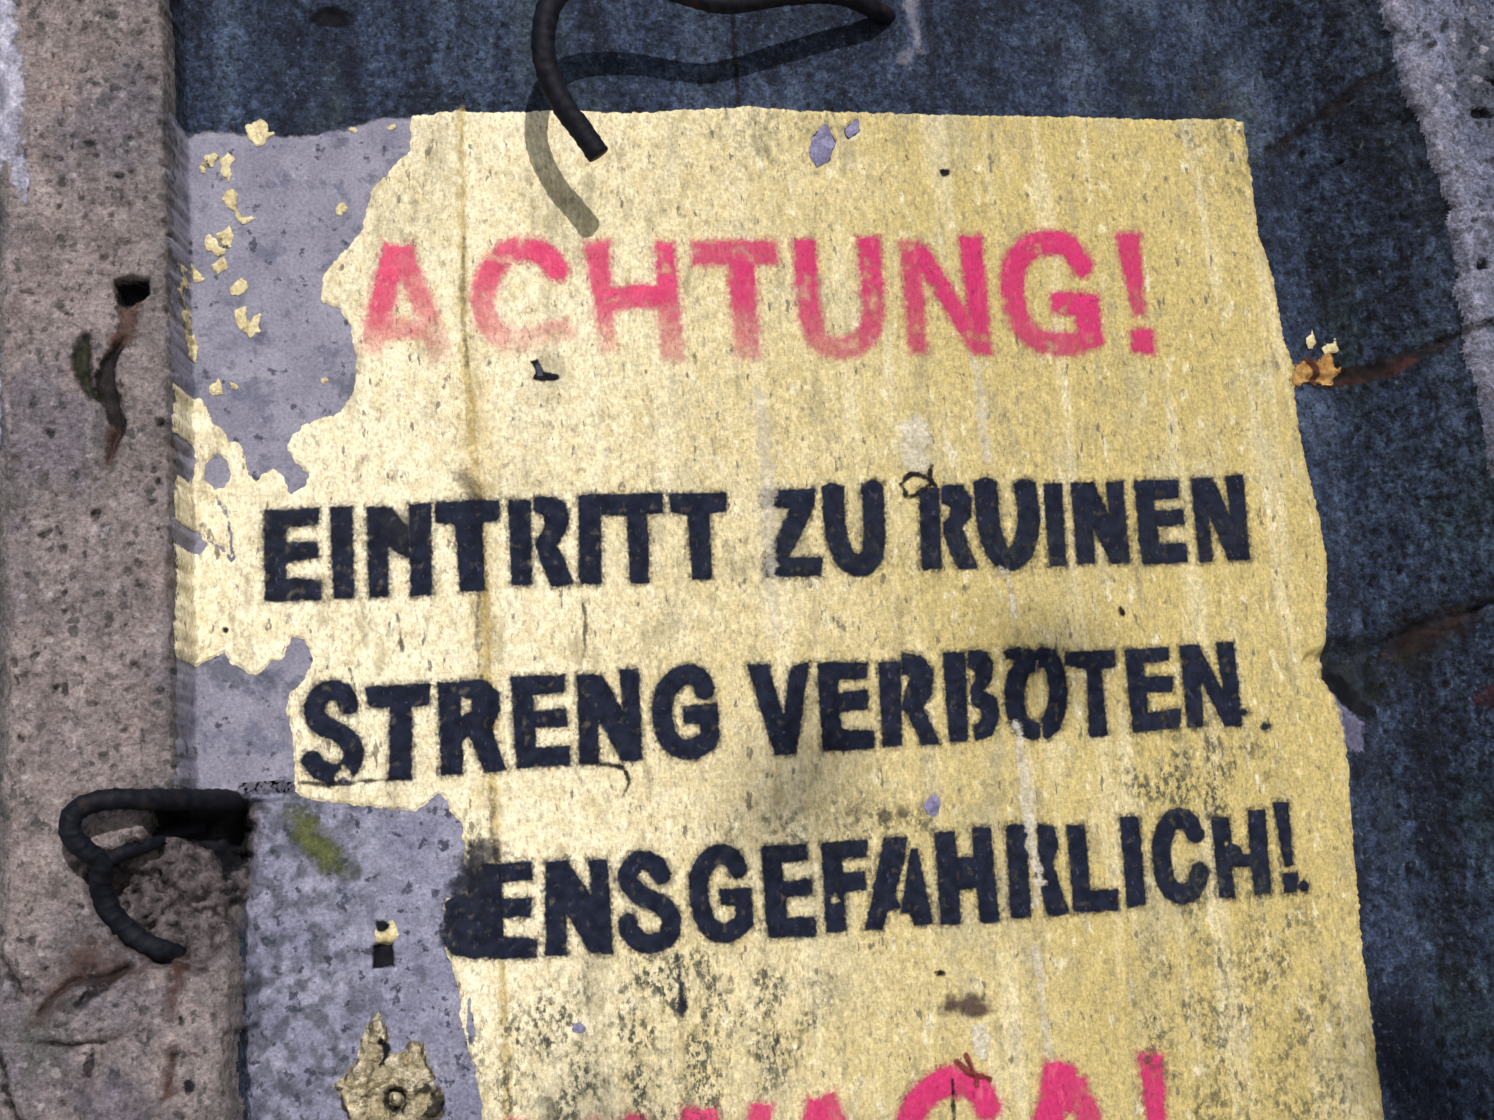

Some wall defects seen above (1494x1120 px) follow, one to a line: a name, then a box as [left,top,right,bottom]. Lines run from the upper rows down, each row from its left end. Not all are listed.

corrosion [116,303,138,351]
peeling [166,112,412,562]
corrosion [1292,332,1341,387]
peeling [112,637,483,1120]